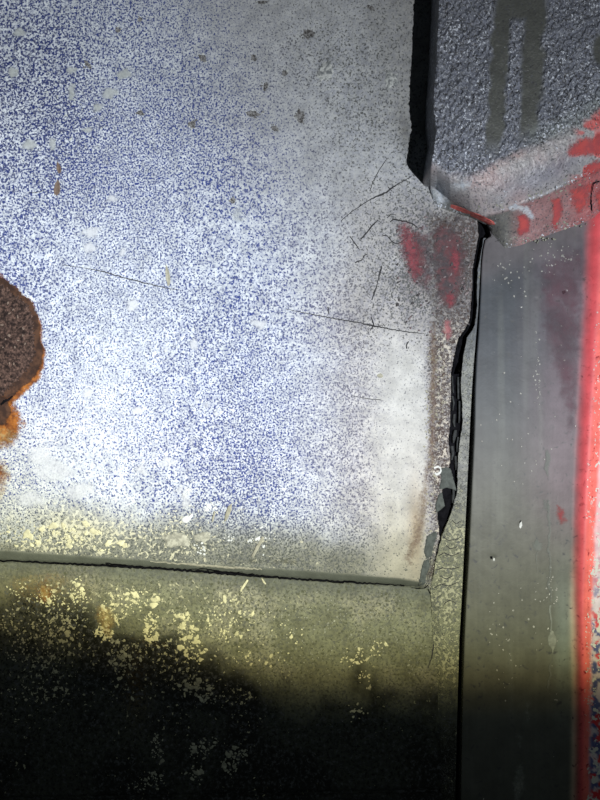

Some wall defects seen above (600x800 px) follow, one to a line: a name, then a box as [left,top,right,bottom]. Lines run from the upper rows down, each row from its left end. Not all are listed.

corrosion [0,275,45,447]
crack [0,222,489,604]
crack [287,160,424,349]
spalling [405,315,461,586]